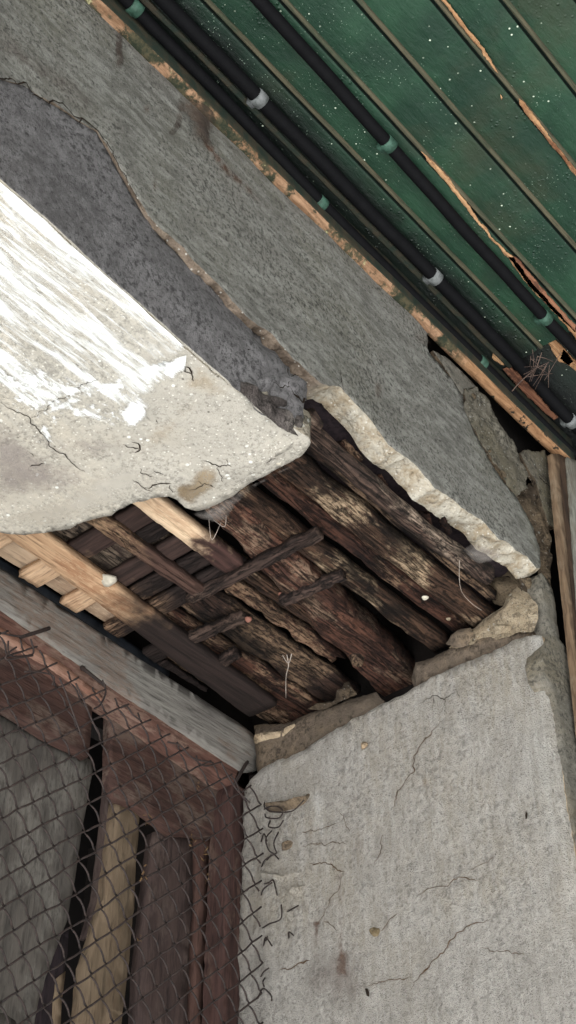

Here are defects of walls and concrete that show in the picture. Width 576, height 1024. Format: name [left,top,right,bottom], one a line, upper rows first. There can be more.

peeling [441,0,498,73]
peeling [519,99,576,175]
peeling [421,151,576,338]
peeling [0,183,186,438]
crack [0,380,96,472]
crack [123,442,230,492]
flaking render [240,381,311,436]
flaking render [412,587,538,687]
crack [393,693,458,808]
crack [298,813,350,930]
crack [418,857,493,895]
crack [367,920,523,987]